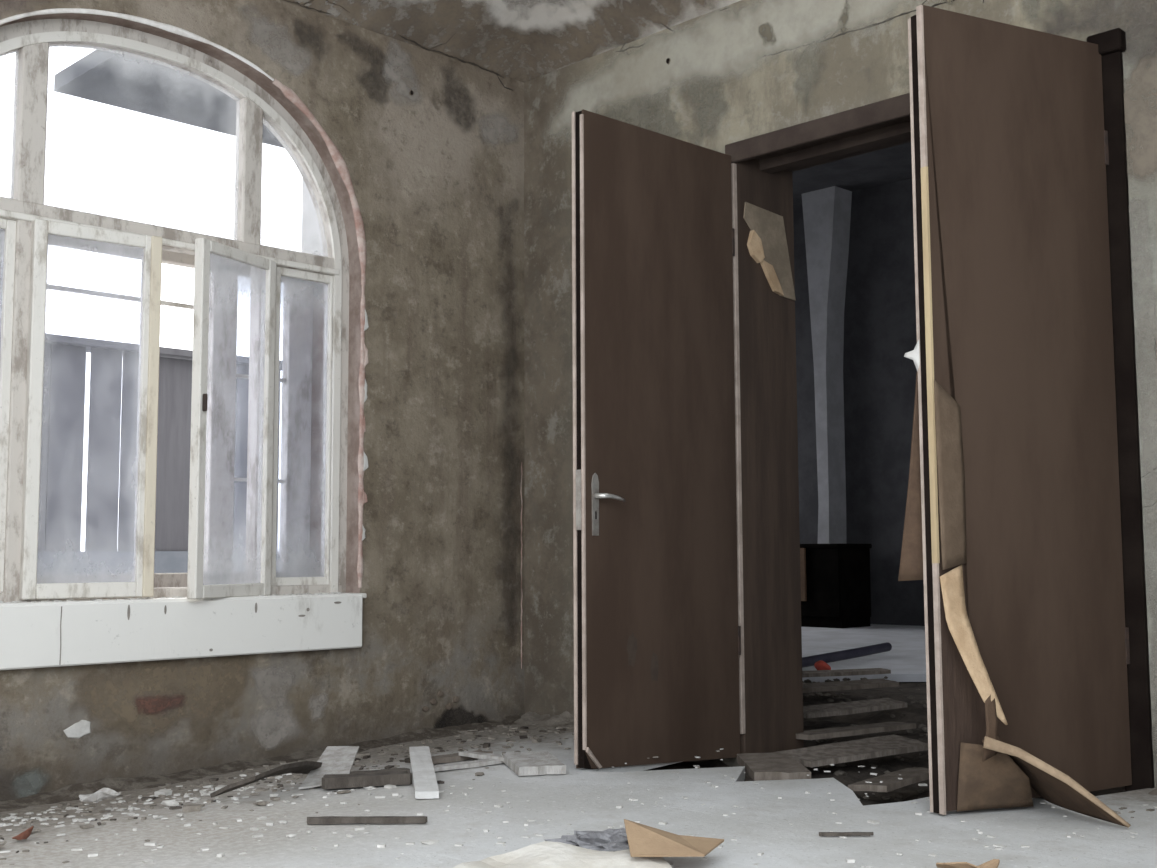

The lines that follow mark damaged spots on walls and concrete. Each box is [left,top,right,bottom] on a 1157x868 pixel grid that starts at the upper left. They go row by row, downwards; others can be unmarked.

damp [282,0,713,128]
damp [759,23,776,42]
crack [756,0,955,60]
damp [604,75,726,145]
flaking render [1124,53,1157,178]